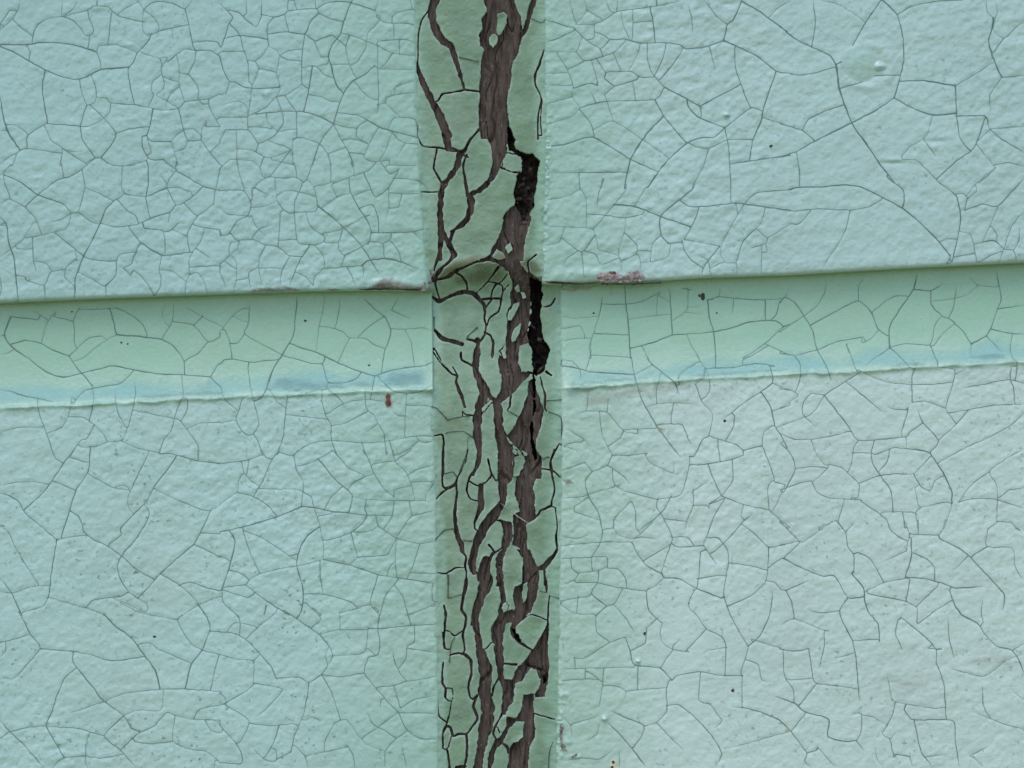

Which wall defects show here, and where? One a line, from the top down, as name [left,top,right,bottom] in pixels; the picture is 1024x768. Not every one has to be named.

crack [0,0,586,768]
peeling [413,0,578,768]
crack [545,279,598,287]
crack [547,0,1024,278]
crack [560,275,1024,767]